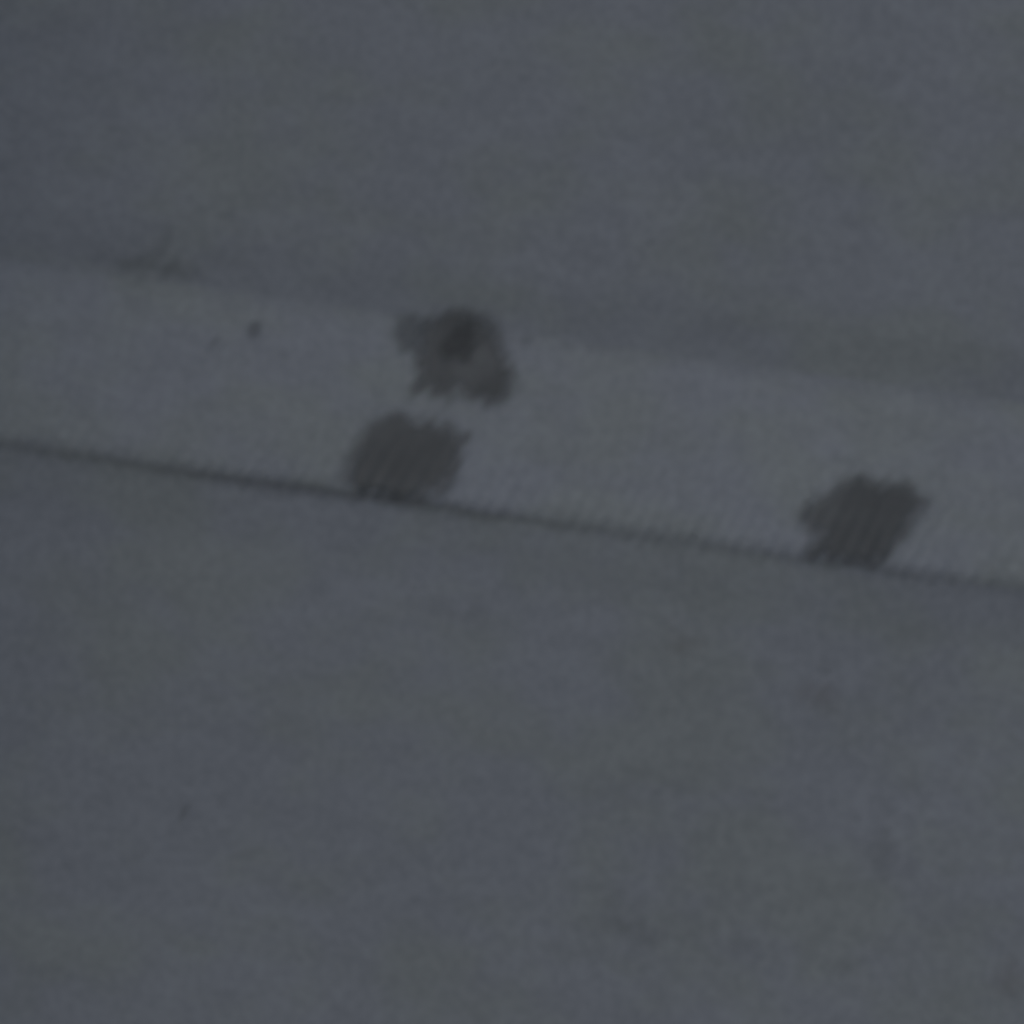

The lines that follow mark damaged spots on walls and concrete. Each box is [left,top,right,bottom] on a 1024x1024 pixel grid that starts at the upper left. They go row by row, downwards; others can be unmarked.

water stain [398,312,510,401]
water stain [353,415,467,500]
water stain [803,477,919,561]